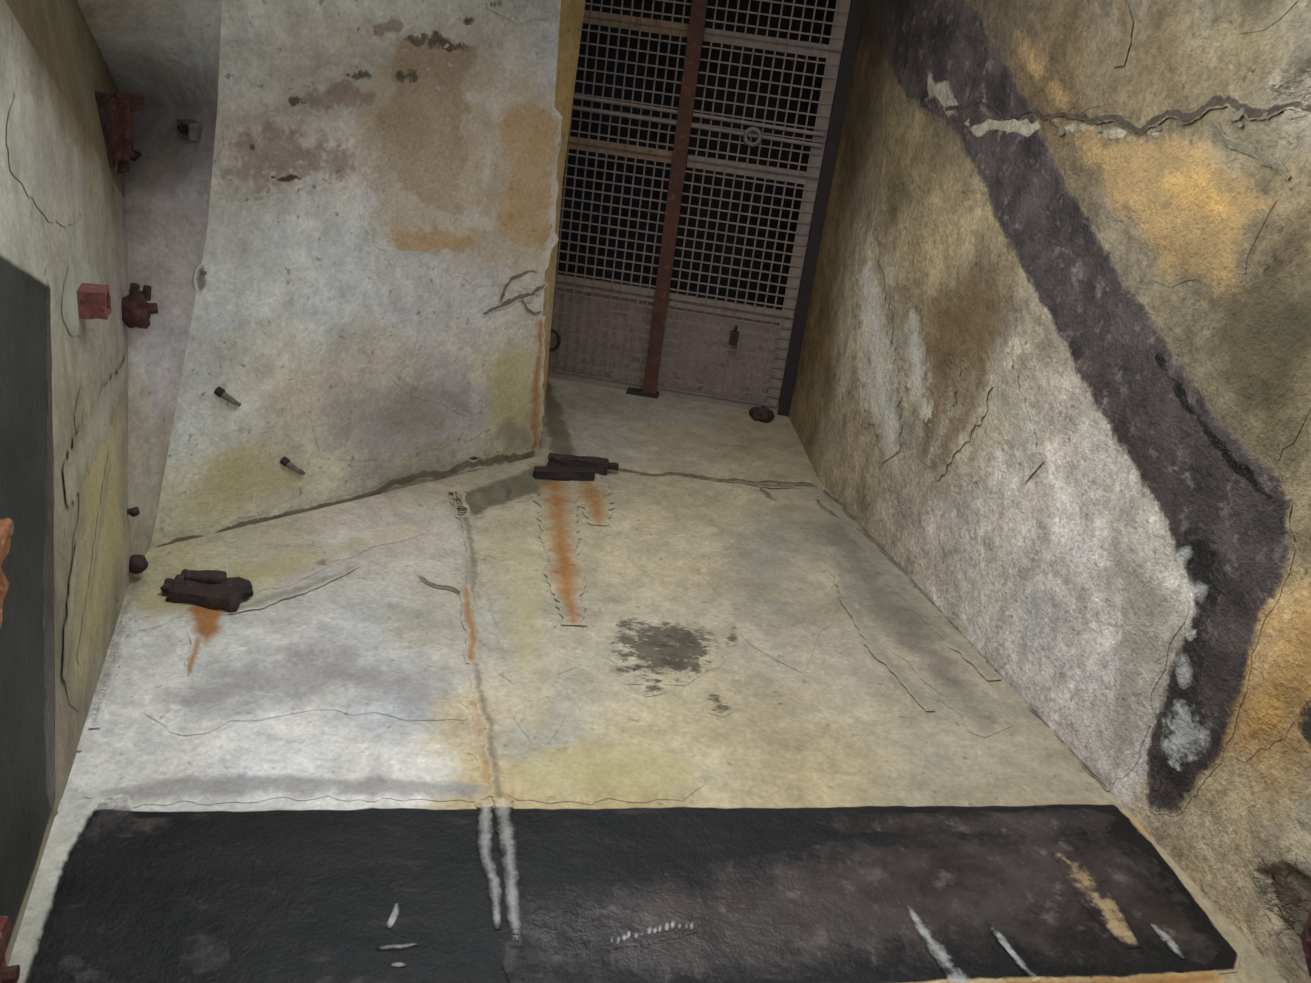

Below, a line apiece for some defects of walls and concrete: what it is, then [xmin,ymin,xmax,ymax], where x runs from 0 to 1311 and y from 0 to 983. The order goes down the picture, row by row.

damp [335,3,555,292]
crack [481,269,547,316]
damp [550,172,559,229]
crack [927,70,1311,180]
rust [524,316,615,626]
rust [184,605,229,679]
crack [153,448,539,804]
damp [8,520,708,983]
damp [606,498,1011,738]
damp [1101,529,1213,784]
damp [1229,609,1311,764]
spalling [1246,848,1311,974]